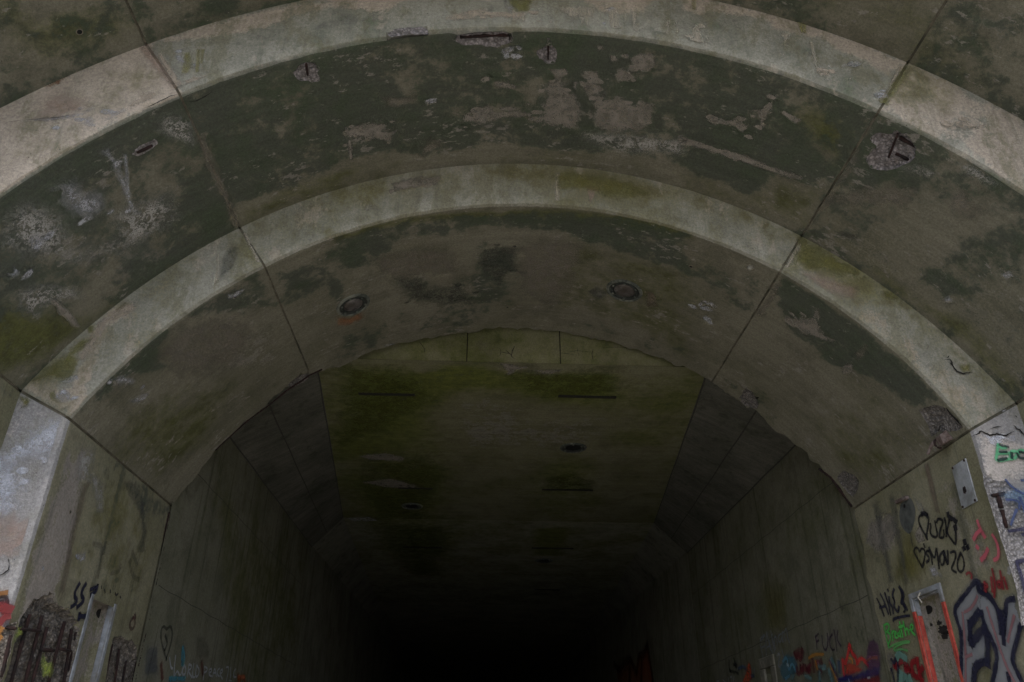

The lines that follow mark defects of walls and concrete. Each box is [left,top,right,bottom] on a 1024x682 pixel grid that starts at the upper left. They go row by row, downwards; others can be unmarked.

spalling [452,32,513,48]
spalling [293,62,320,82]
peeling [463,38,655,133]
spalling [866,130,916,171]
damp [63,151,133,226]
crack [935,408,1024,436]
spalling [0,593,79,682]